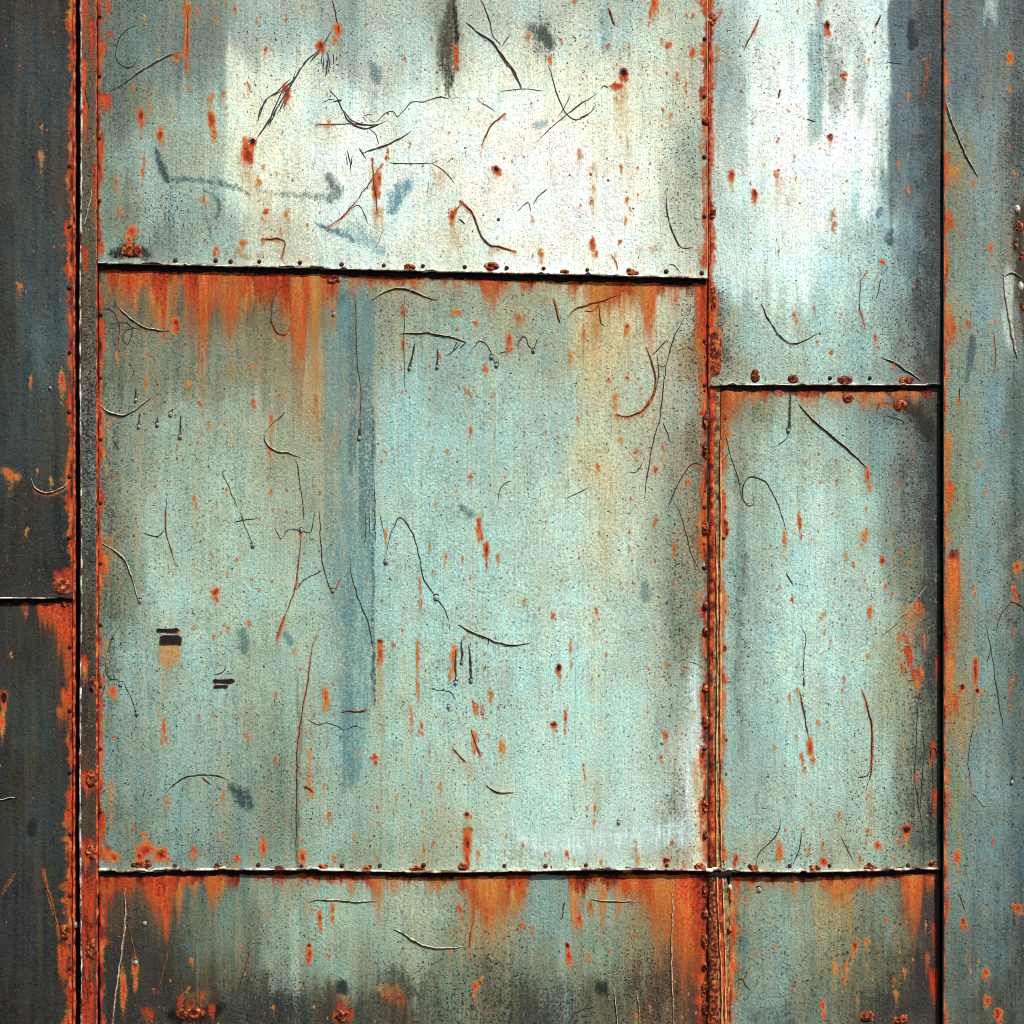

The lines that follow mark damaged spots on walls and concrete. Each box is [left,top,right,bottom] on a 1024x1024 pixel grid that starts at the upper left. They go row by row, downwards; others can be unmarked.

leakage [438,0,459,96]
leakage [907,19,920,50]
rust [506,313,526,352]
leakage [324,286,376,788]
rust [255,811,535,941]
rust [120,958,138,1008]
rust [176,988,215,1020]
rust [832,938,870,993]
rust [856,998,875,1022]
rust [893,1015,908,1024]